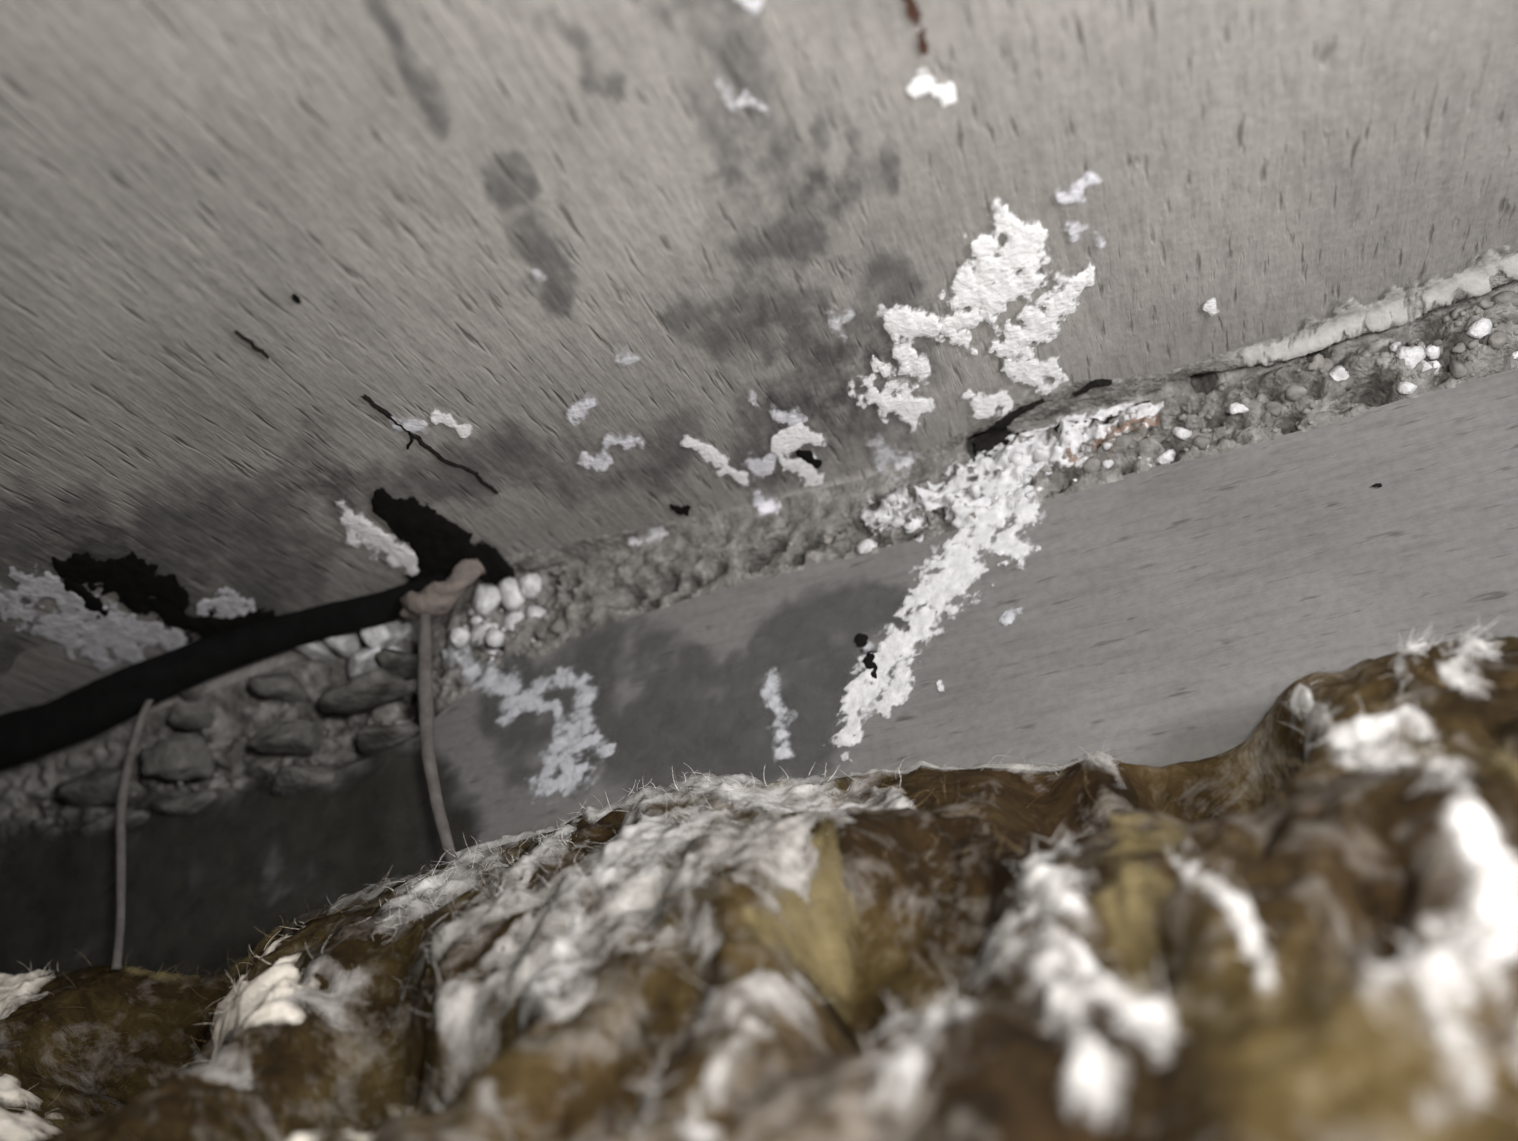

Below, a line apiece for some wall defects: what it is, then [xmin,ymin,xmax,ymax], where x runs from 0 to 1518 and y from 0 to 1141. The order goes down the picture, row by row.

leakage [740,0,763,15]
rust [904,0,929,55]
leakage [907,68,956,107]
leakage [1056,172,1102,204]
leakage [390,409,472,438]
spalling [796,449,822,469]
leakage [441,198,1164,797]
peeling [336,488,515,588]
peeling [0,551,275,673]
spalling [854,633,878,679]
spalling [247,617,433,796]
spalling [54,683,241,836]